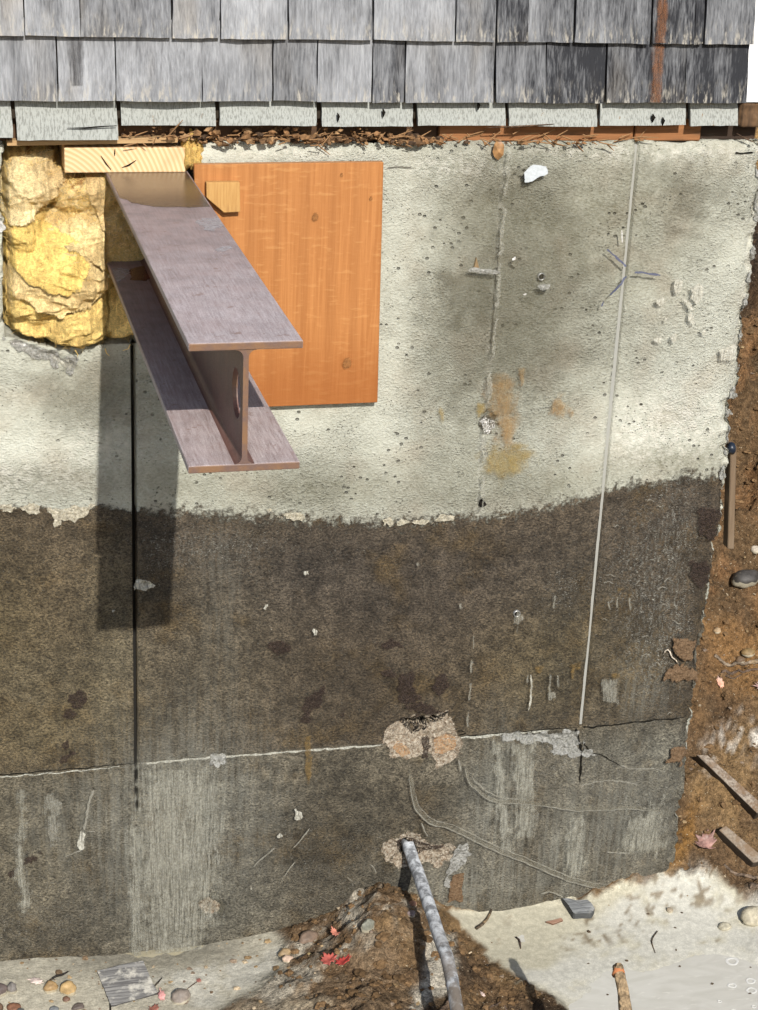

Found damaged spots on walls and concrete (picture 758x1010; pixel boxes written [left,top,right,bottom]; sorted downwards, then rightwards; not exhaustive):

damp [0,467,725,961]
spalling [381,668,464,769]
spalling [381,832,472,903]